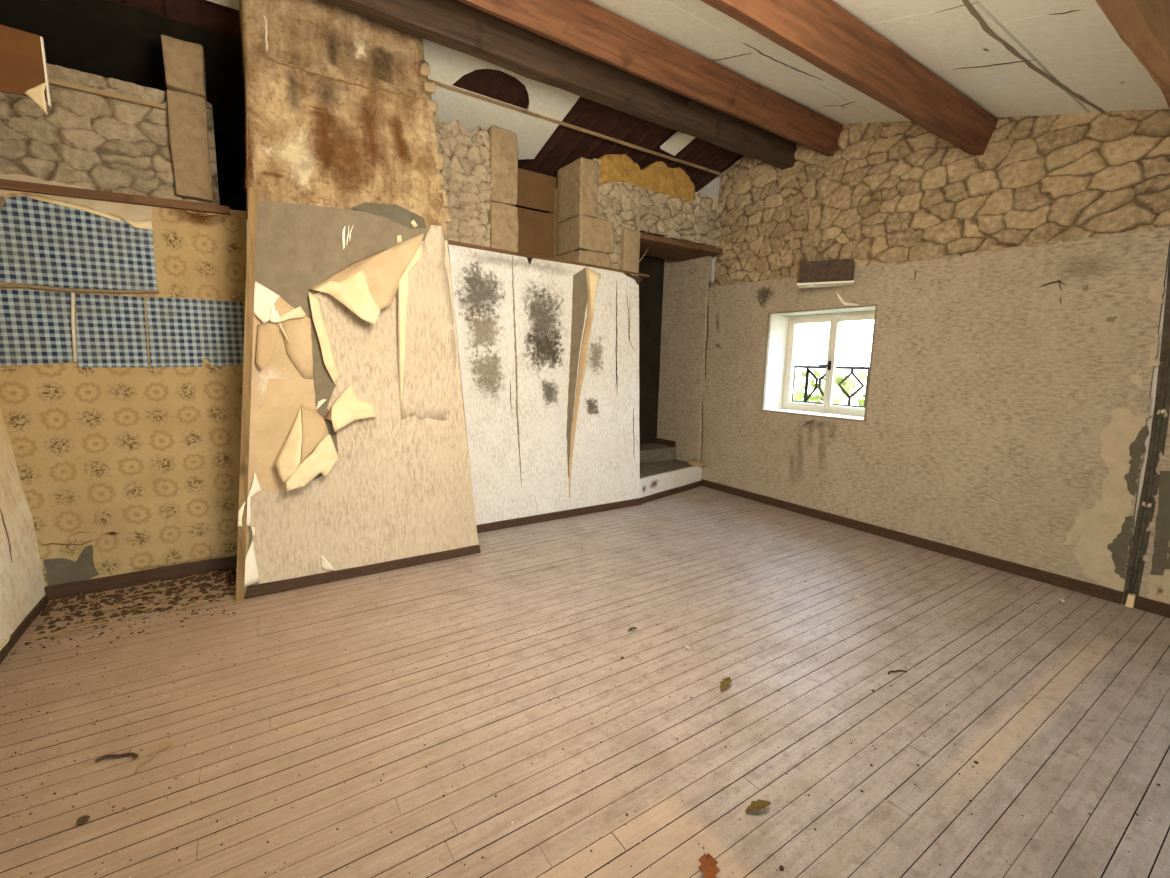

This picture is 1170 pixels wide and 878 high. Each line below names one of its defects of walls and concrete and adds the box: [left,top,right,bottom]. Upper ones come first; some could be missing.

crack [954,60,1033,70]
peeling [351,202,426,243]
peeling [256,307,336,410]
peeling [312,270,380,325]
water stain [455,263,504,397]
water stain [523,282,563,368]
water stain [541,382,558,406]
peeling [566,267,588,477]
water stain [587,399,599,414]
water stain [587,339,603,372]
peeling [1061,333,1161,591]
flaking render [44,545,100,586]